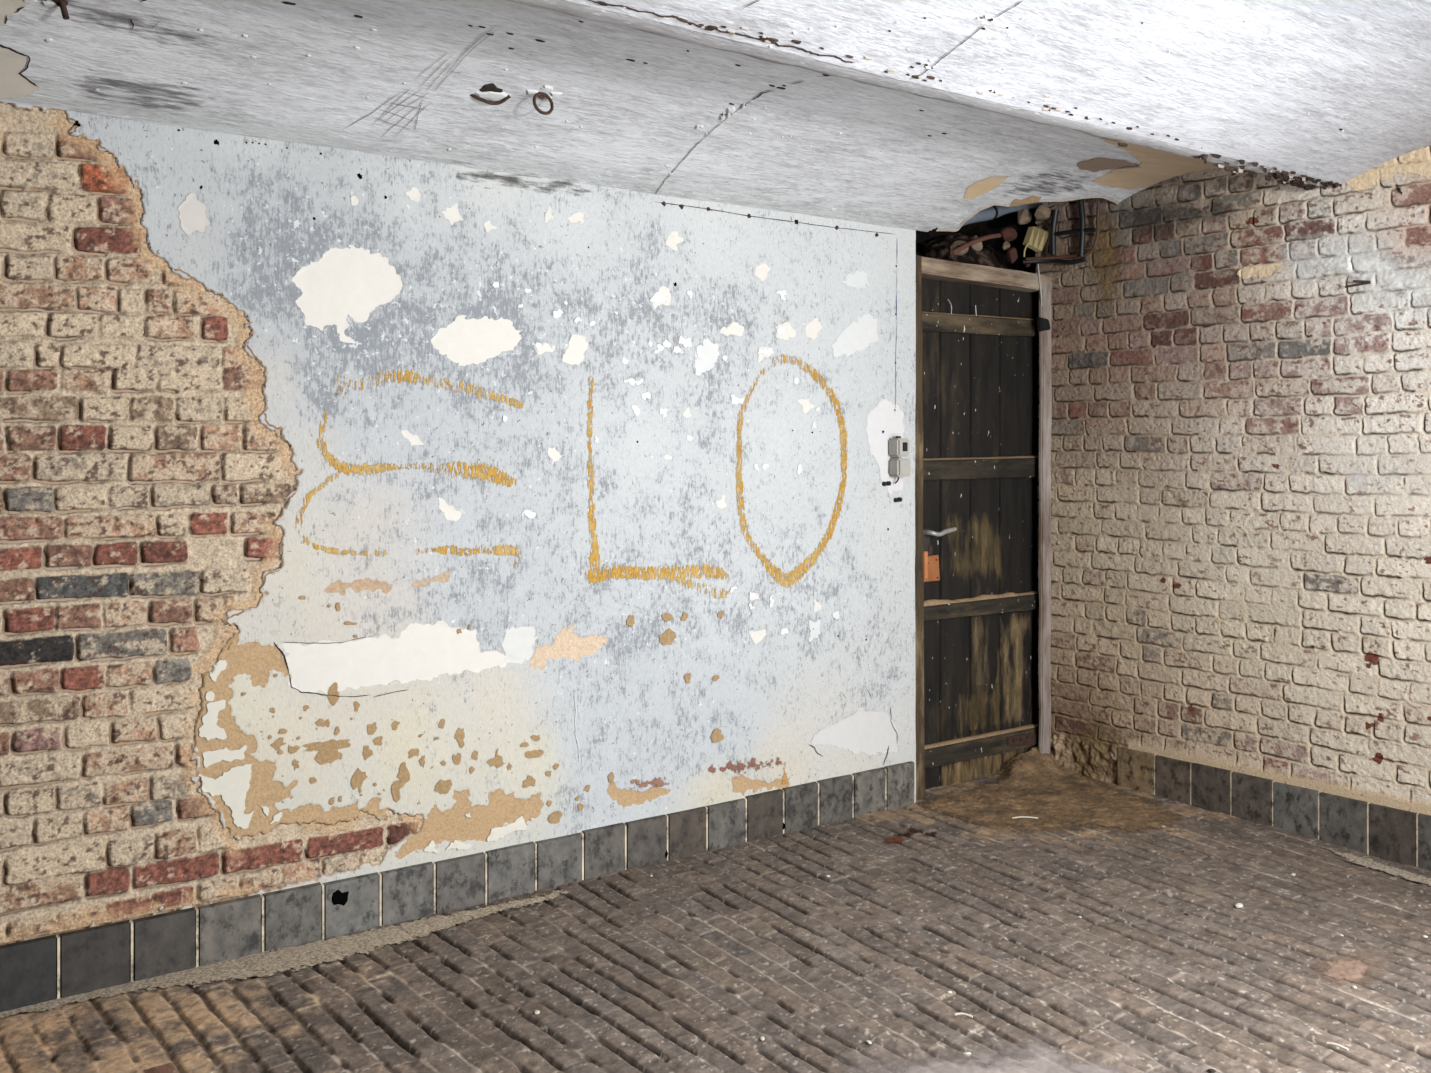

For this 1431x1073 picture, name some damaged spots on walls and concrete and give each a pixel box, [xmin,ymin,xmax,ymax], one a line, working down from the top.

peeling [588,0,942,82]
crack [656,76,823,193]
peeling [936,90,1342,232]
peeling [622,357,692,419]
flaking render [866,399,904,495]
spalling [0,44,608,944]
peeling [659,613,688,645]
spalling [1365,652,1380,668]
peeling [710,728,724,743]
flaking render [811,707,898,757]
flaking render [607,772,670,807]
rust [708,757,788,784]